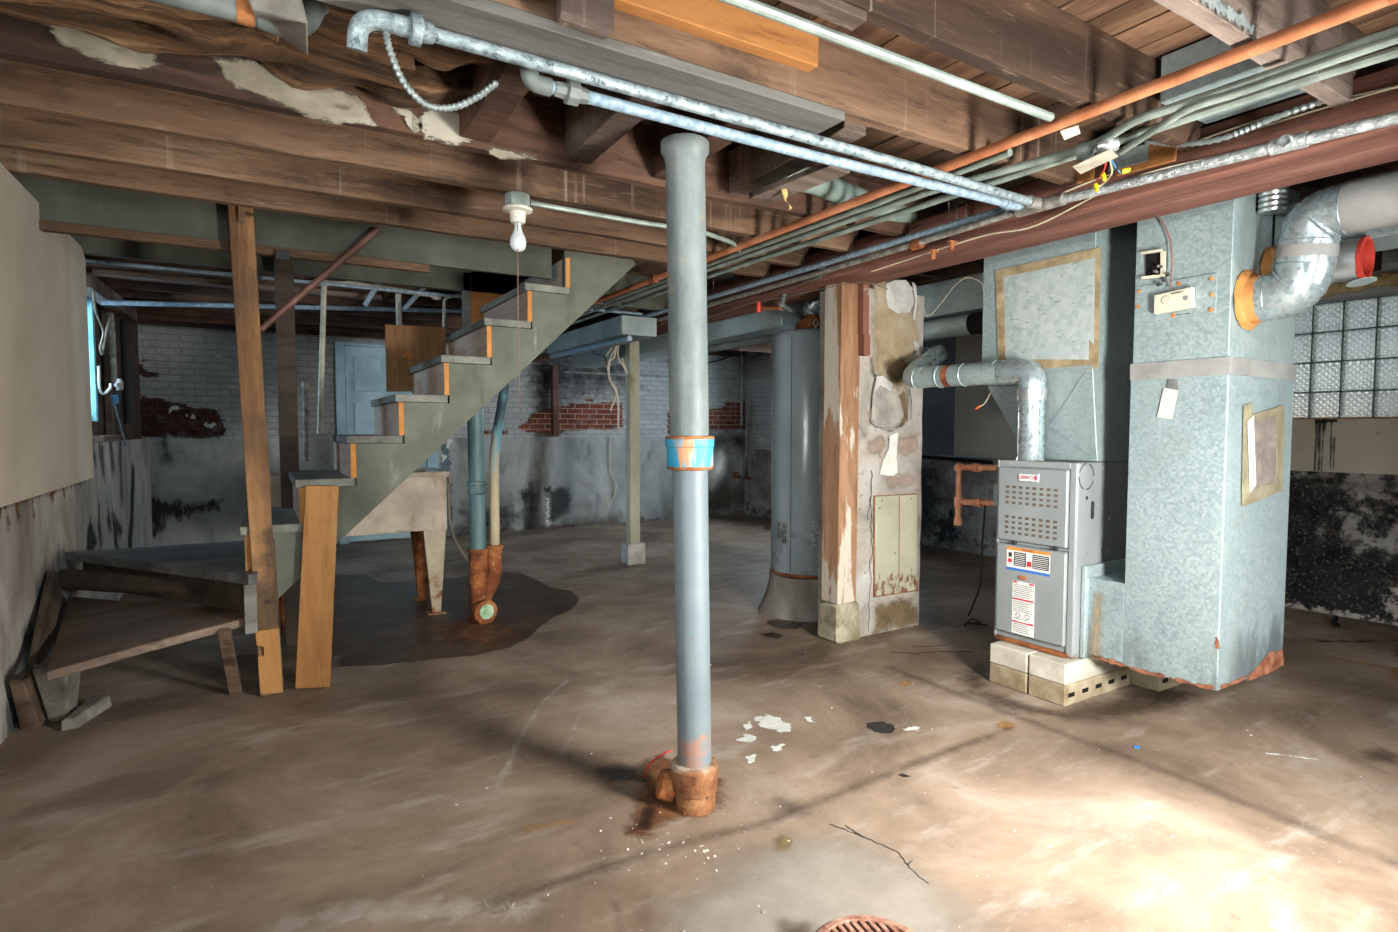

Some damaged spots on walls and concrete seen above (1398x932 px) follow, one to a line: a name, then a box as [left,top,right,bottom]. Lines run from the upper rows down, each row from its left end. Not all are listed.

peeling [45,24,158,69]
peeling [213,57,377,126]
peeling [392,107,473,145]
flaking render [140,396,227,439]
flaking render [484,398,624,435]
water stain [709,434,745,447]
water stain [87,433,135,550]
water stain [151,497,224,537]
water stain [458,432,551,535]
water stain [1285,419,1398,656]
rust [1091,596,1284,689]
rust [600,754,688,836]